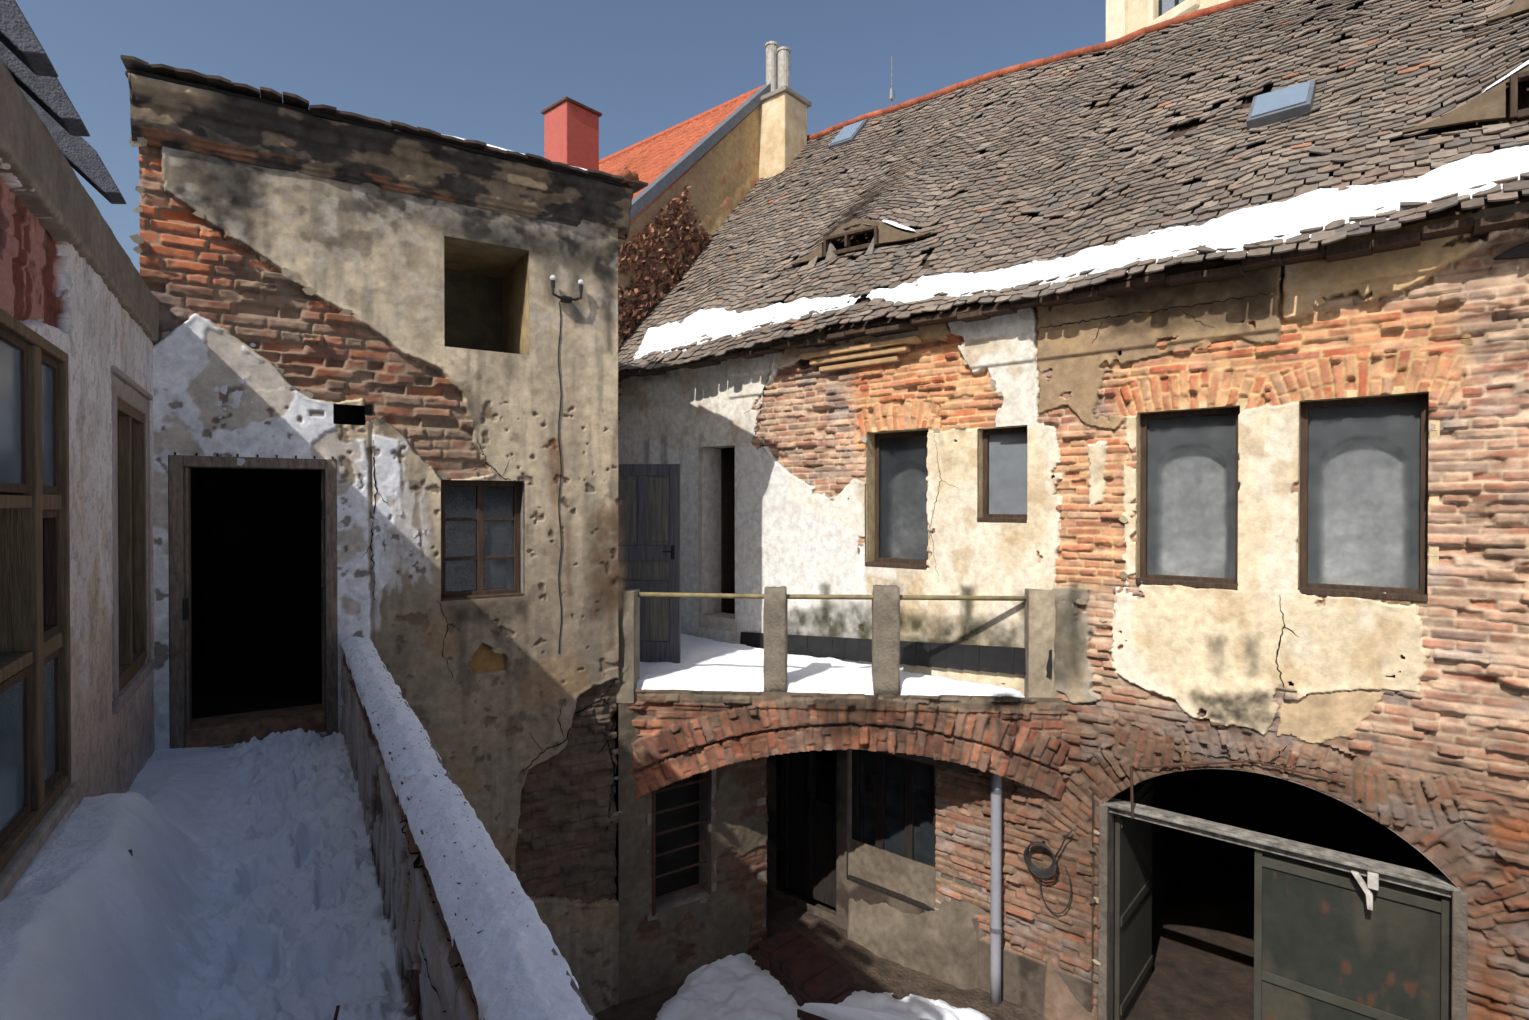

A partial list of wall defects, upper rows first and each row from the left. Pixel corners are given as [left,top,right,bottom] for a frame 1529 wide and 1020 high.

spalling [129,136,493,479]
spalling [750,327,1004,499]
spalling [469,643,507,673]
spalling [935,229,1529,1020]
crack [1275,598,1299,696]
crack [399,816,479,1020]